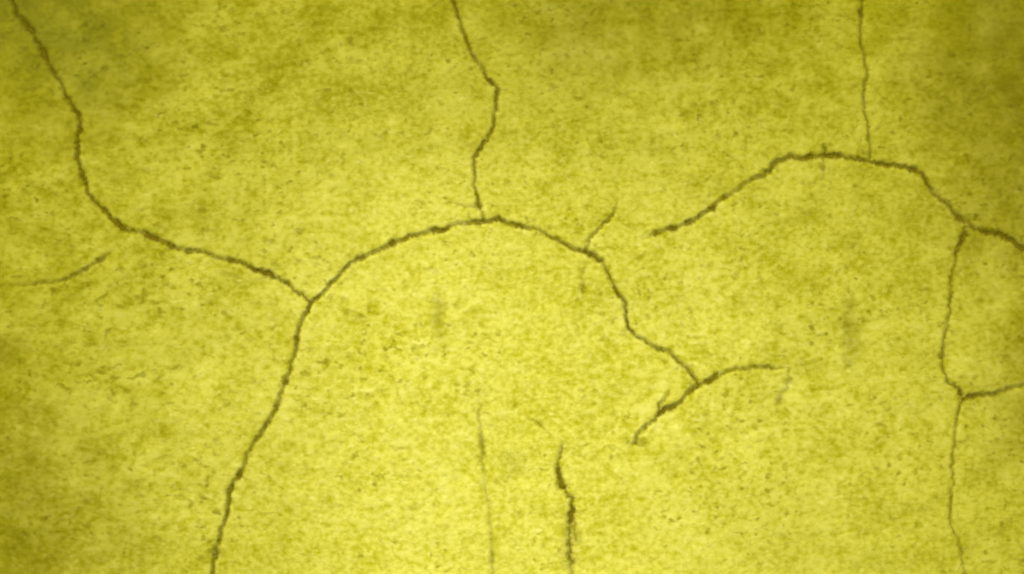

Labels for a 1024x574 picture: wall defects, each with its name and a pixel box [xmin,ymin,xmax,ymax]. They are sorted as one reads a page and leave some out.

crack [755,134,1024,255]
crack [12,0,773,574]
crack [940,353,1007,412]